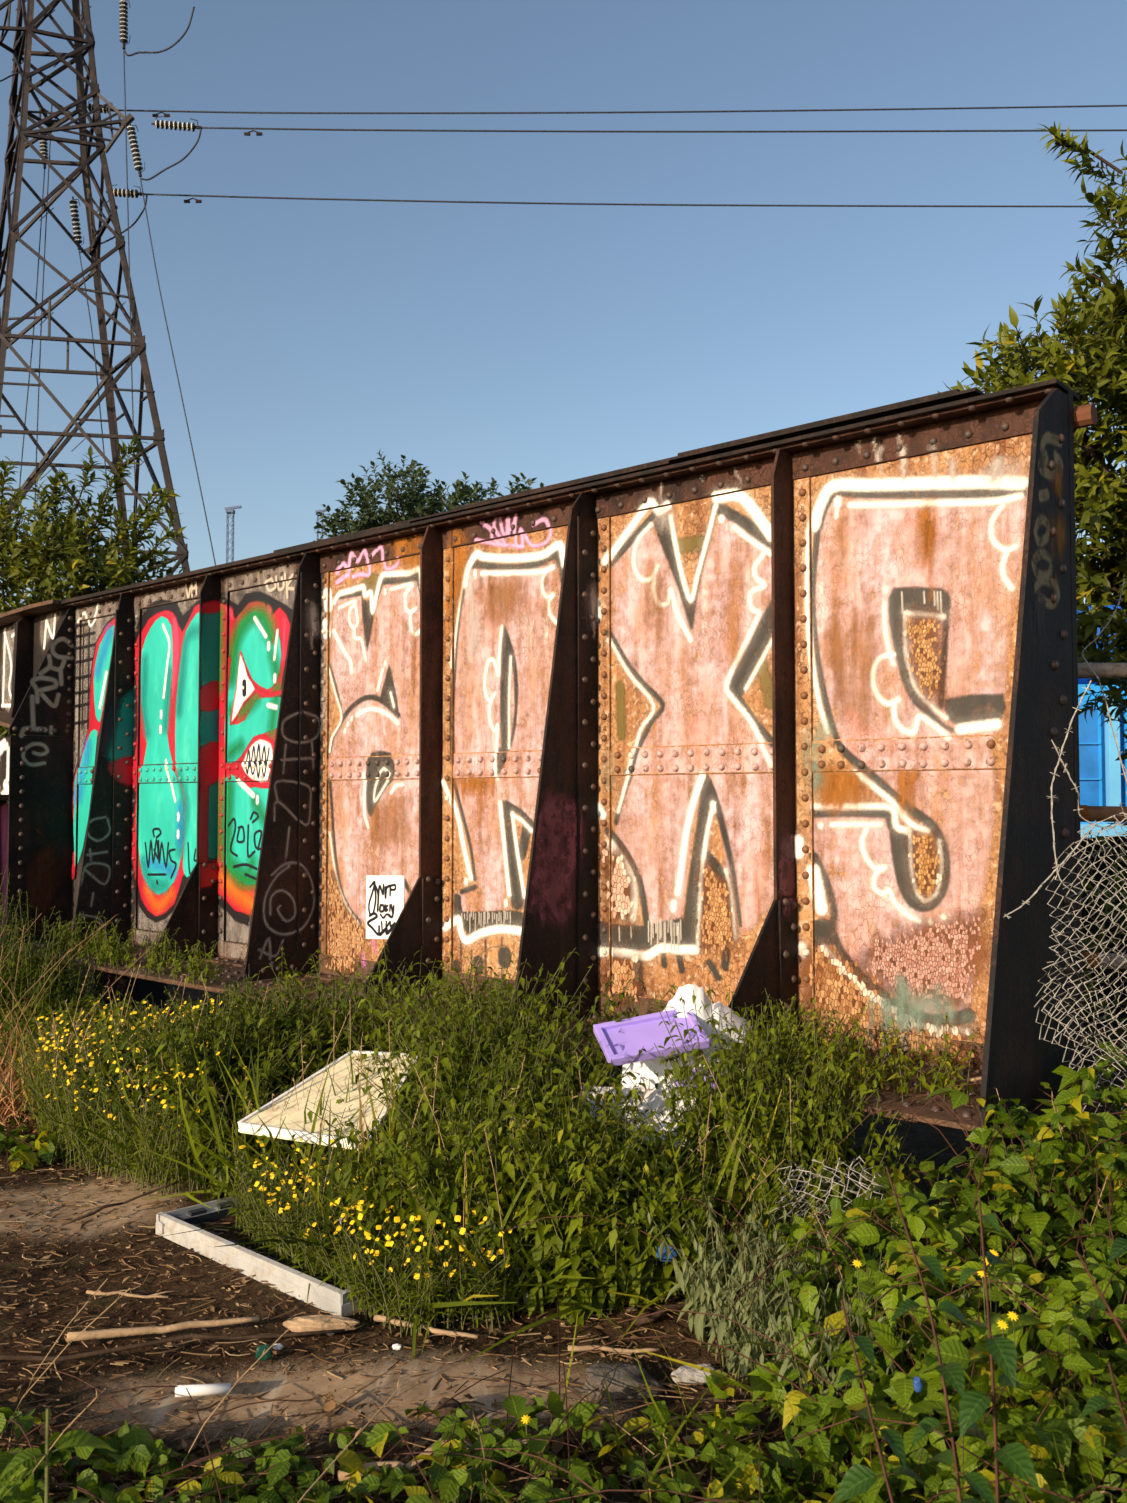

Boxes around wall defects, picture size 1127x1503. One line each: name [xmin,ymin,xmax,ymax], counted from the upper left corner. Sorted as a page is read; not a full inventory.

rust [390,534,420,567]
rust [921,507,935,559]
rust [445,532,467,636]
rust [455,776,494,813]
rust [820,770,859,809]
rust [898,771,916,805]